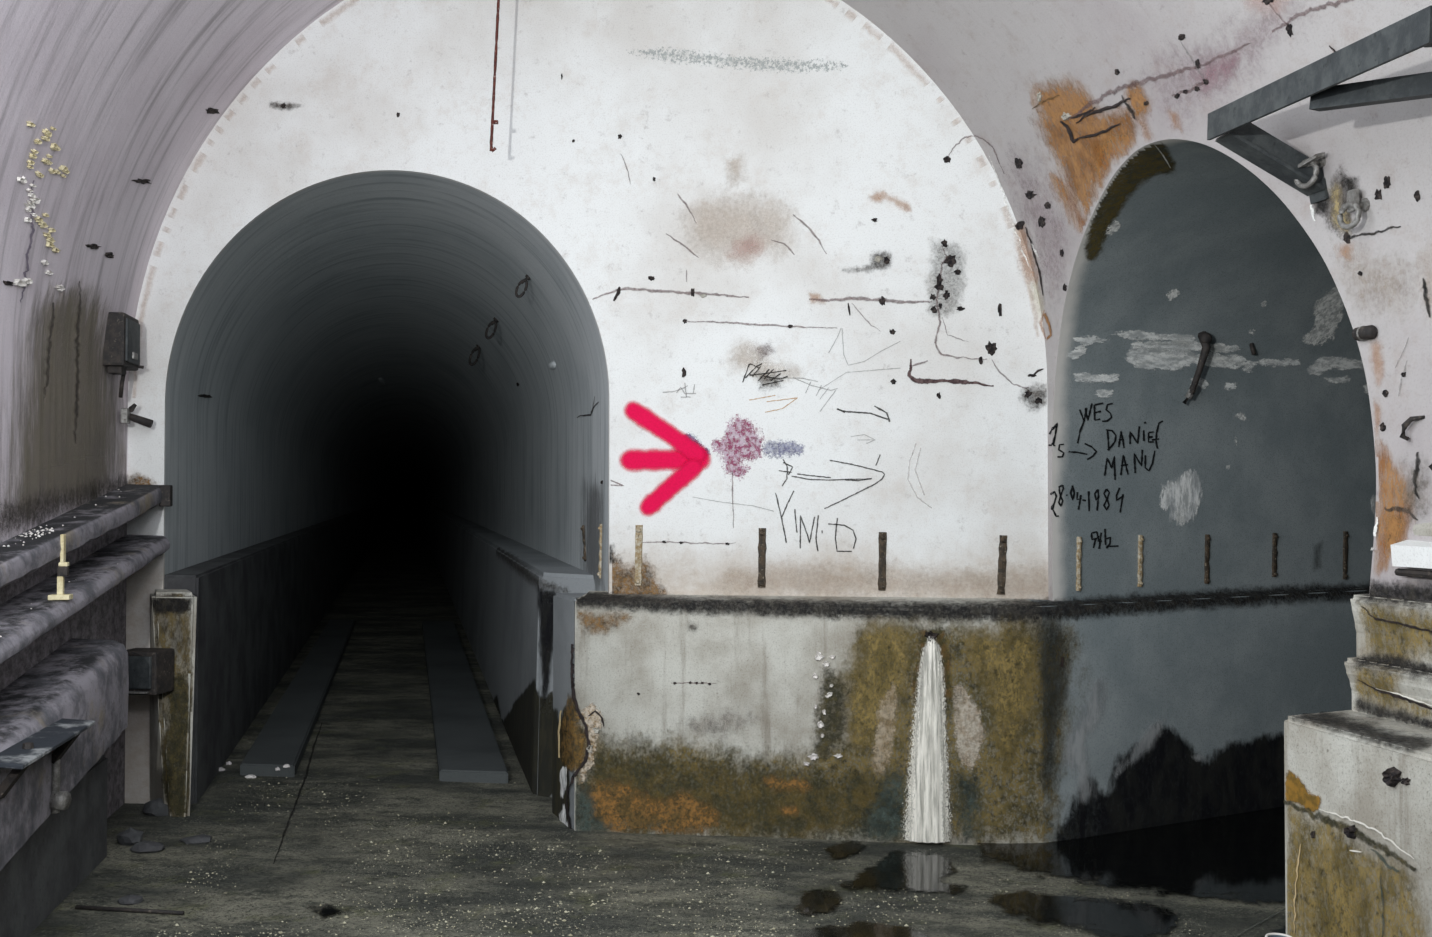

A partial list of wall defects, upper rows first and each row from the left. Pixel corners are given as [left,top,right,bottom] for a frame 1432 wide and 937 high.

corrosion [1032,69,1148,228]
peeling [1068,286,1364,398]
leakage [0,478,126,532]
corrosion [1377,450,1410,568]
leakage [494,547,570,824]
spalling [558,644,604,829]
leakage [576,582,1432,841]
corrosion [1285,770,1320,812]